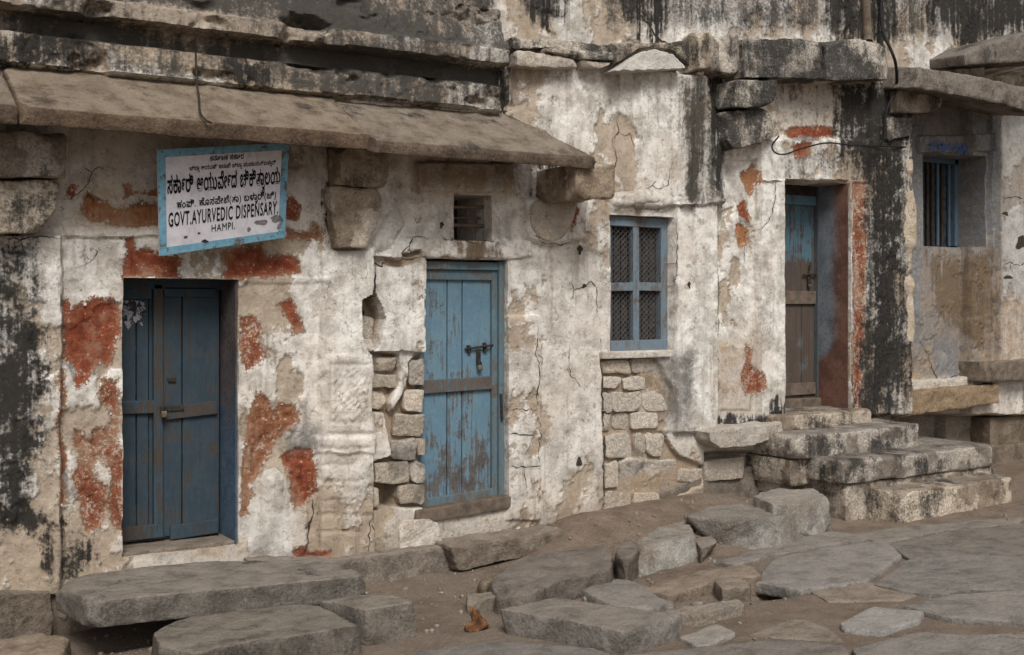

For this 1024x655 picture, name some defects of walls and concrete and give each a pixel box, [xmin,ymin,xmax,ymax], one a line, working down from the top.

peeling [64,182,184,280]
leakage [684,77,723,215]
peeling [734,163,764,248]
peeling [783,124,836,160]
leakage [832,81,913,419]
leakage [0,234,102,580]
peeling [54,292,123,538]
peeling [238,315,270,374]
peeling [238,390,320,517]
peeling [277,297,306,336]